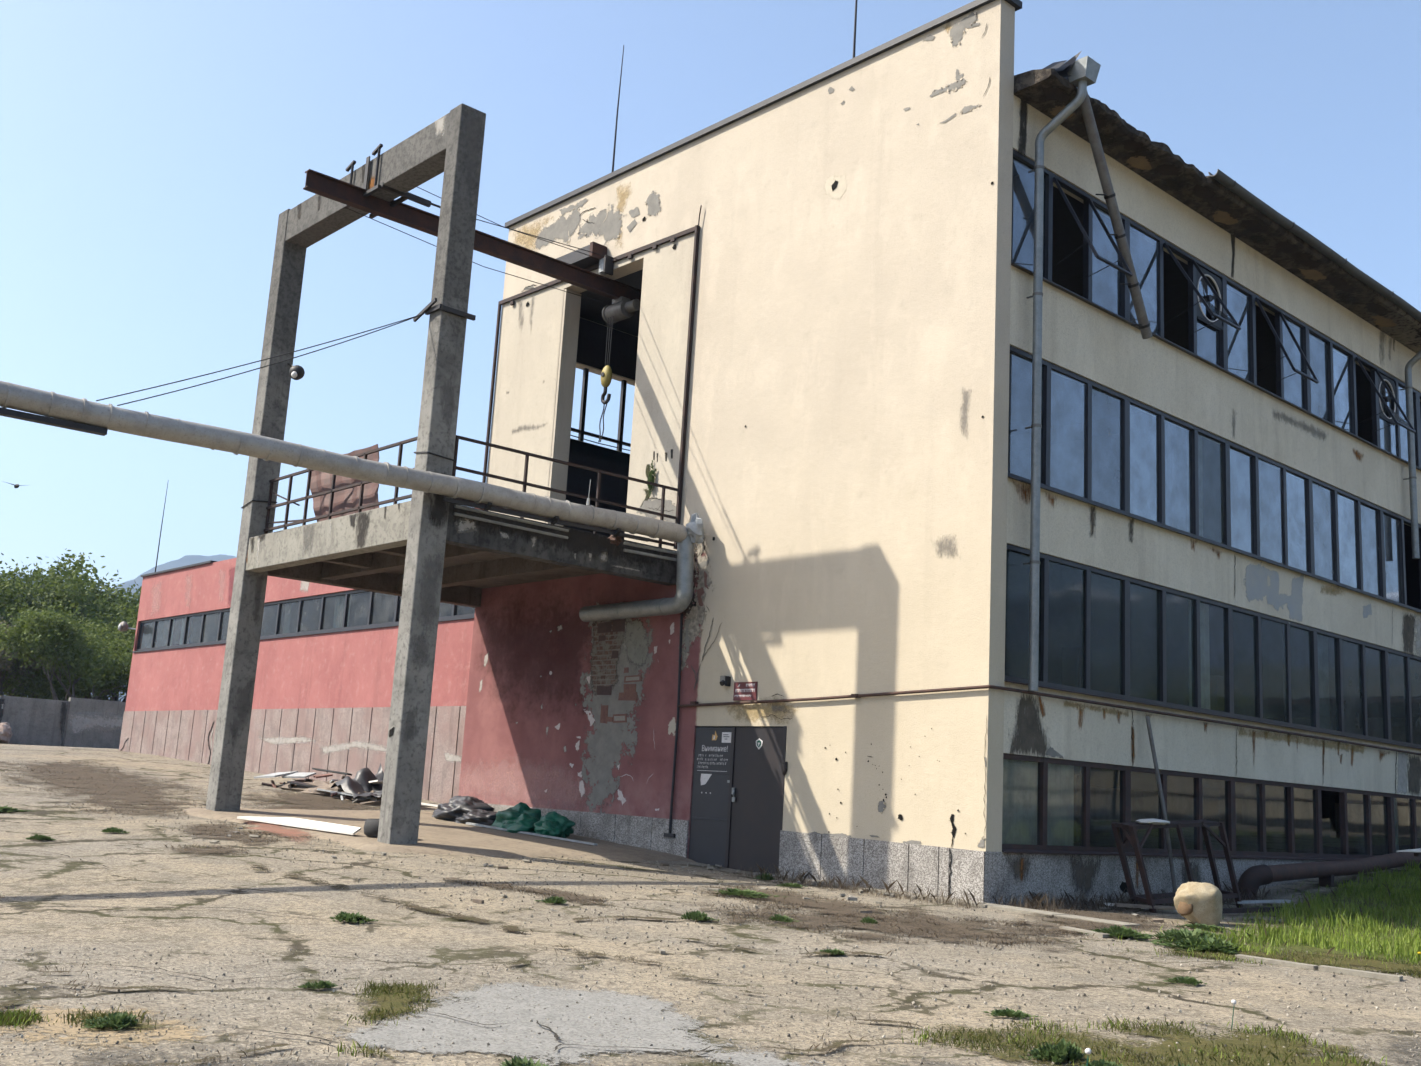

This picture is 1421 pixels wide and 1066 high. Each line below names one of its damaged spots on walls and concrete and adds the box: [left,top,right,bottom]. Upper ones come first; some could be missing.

flaking render [923,11,987,47]
flaking render [930,69,966,97]
flaking render [940,78,990,123]
flaking render [535,191,661,249]
peeling [1244,562,1306,624]
spalling [546,602,655,813]
flaking render [668,717,676,736]
leakage [1008,693,1064,759]